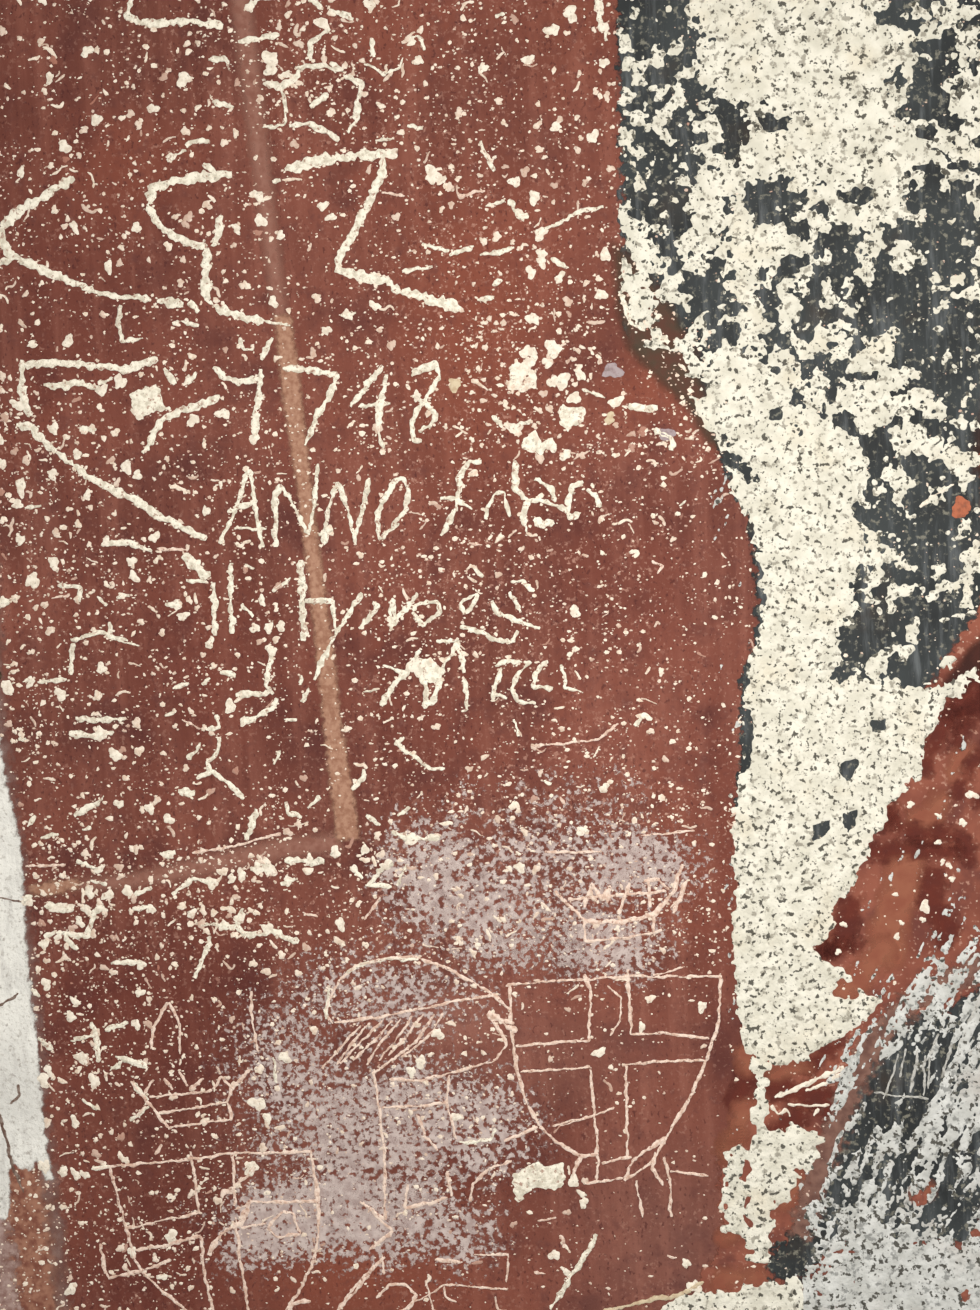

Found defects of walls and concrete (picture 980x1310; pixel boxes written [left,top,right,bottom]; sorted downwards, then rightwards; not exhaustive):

peeling [542,5,577,36]
peeling [586,129,599,143]
flaking render [594,0,980,1310]
crack [0,993,19,1006]
crack [0,1084,24,1193]